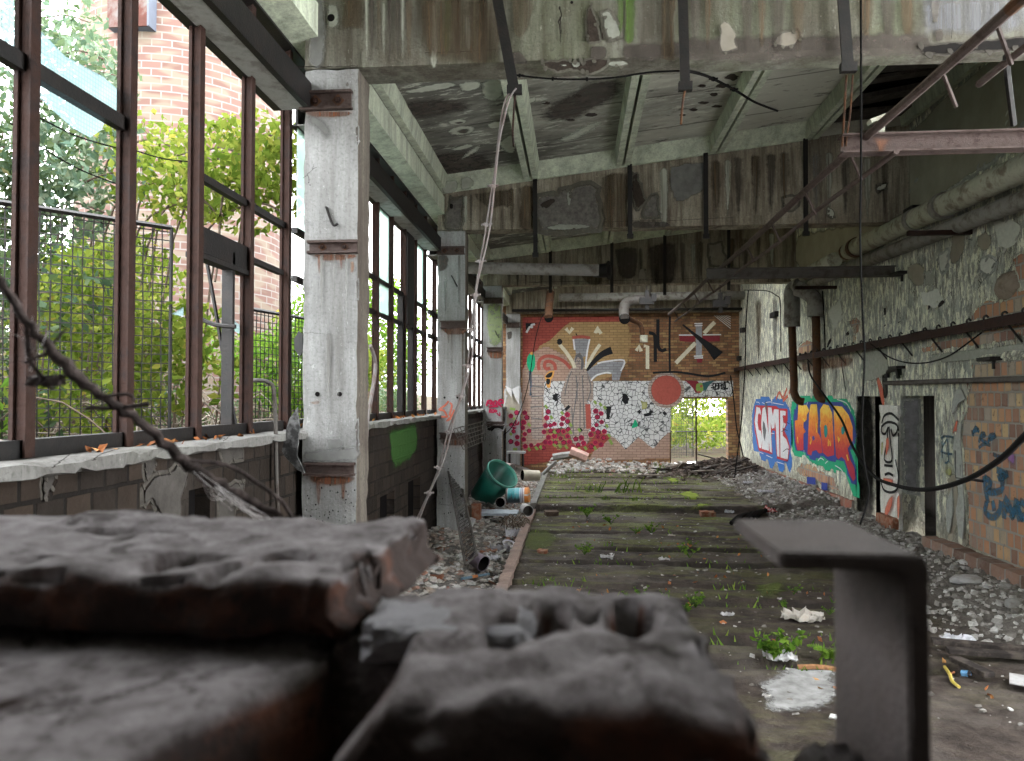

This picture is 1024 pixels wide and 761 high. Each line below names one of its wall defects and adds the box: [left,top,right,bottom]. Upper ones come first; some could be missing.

peeling [585,2,624,44]
peeling [719,22,737,55]
peeling [774,28,802,49]
water stain [406,80,503,101]
water stain [449,119,480,157]
spalling [531,180,604,237]
water stain [602,153,789,229]
flaking render [919,216,1024,568]
corrosion [311,476,354,504]